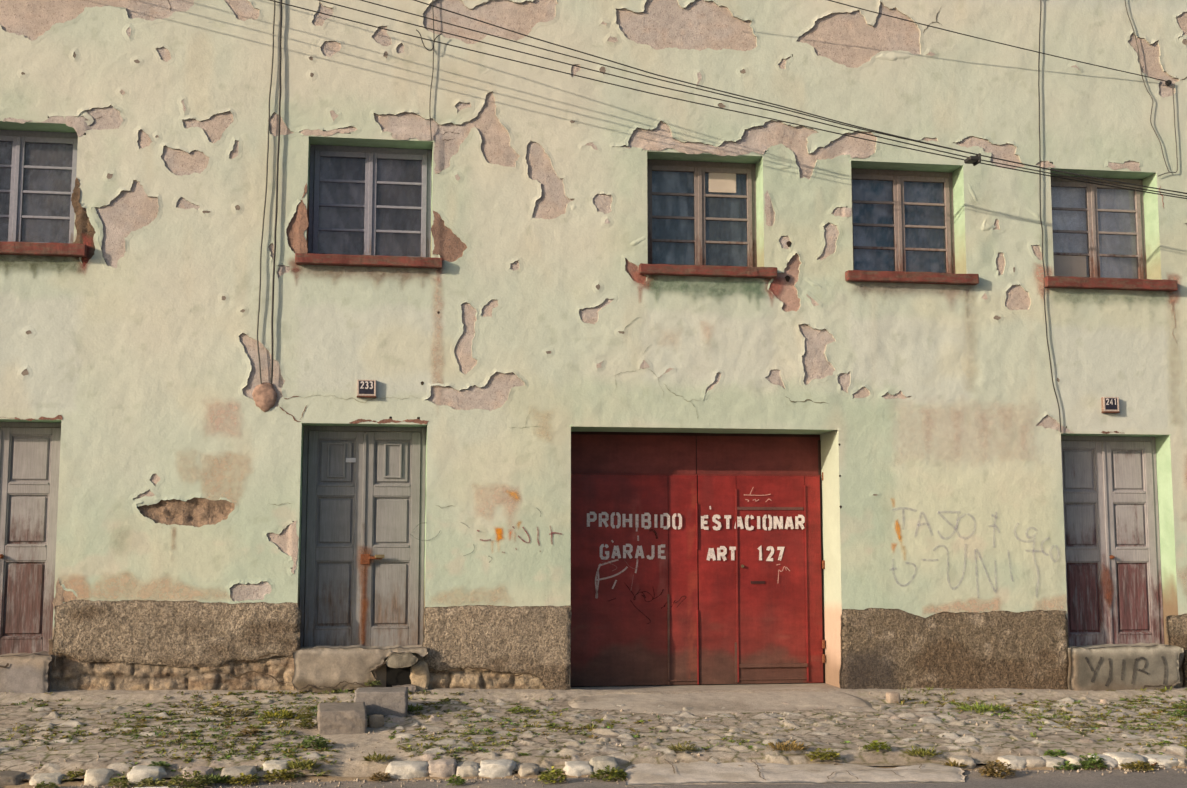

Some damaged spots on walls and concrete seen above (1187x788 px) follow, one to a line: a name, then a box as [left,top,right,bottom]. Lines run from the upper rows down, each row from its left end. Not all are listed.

peeling [0,0,199,45]
peeling [130,43,175,67]
peeling [419,0,562,48]
peeling [598,0,761,78]
peeling [774,0,939,73]
peeling [1124,8,1187,101]
peeling [0,86,245,272]
peeling [264,88,616,228]
peeling [578,116,881,184]
peeling [761,190,916,403]
peeling [421,295,529,415]
spalling [129,469,239,532]